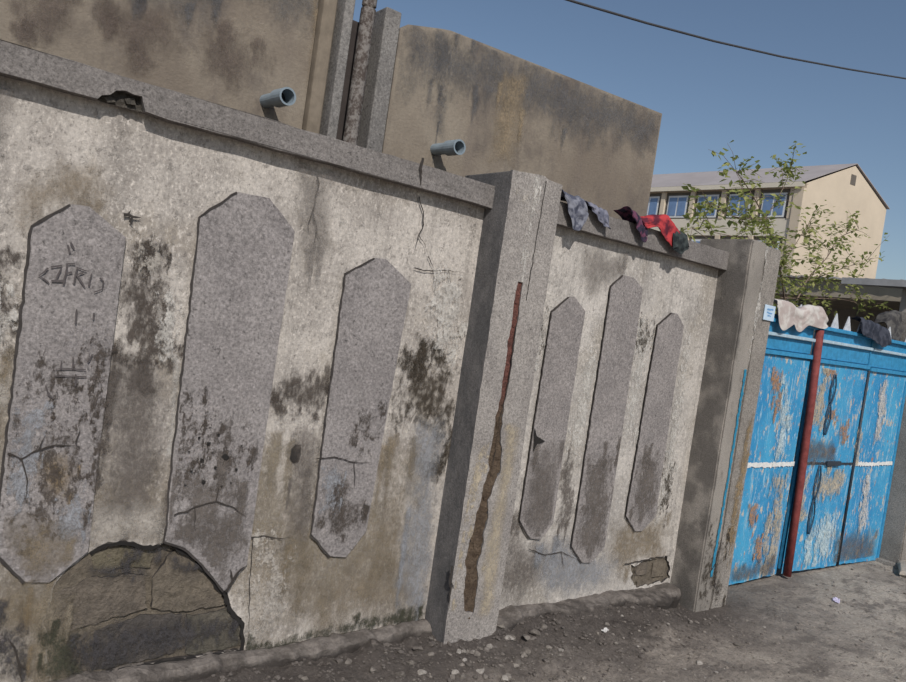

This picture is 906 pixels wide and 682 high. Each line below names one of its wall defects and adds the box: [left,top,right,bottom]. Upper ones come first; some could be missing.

spalling [98,91,142,112]
water stain [412,33,654,154]
crack [414,158,463,283]
water stain [0,564,72,682]
crack [7,430,86,502]
spalling [43,510,296,681]
water stain [0,240,455,622]
crack [174,484,289,620]
crack [316,456,370,486]
spalling [631,556,668,587]
peeling [760,374,793,576]
peeling [799,466,847,567]